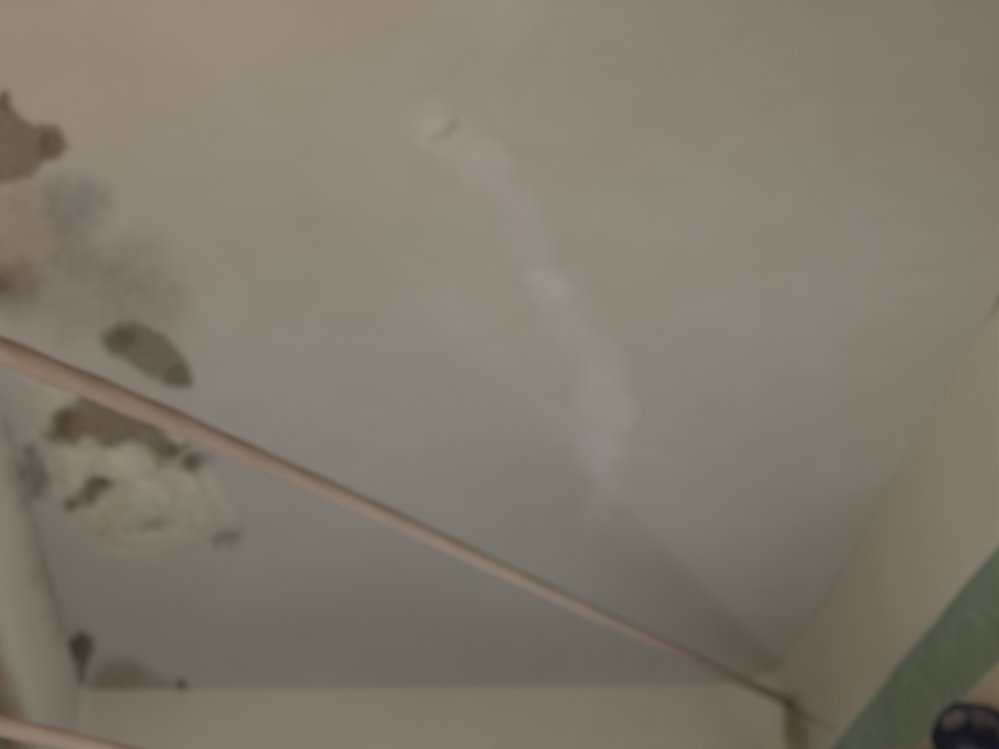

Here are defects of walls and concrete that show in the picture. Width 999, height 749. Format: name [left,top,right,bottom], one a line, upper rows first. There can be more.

peeling [0,96,65,182]
spalling [106,325,189,386]